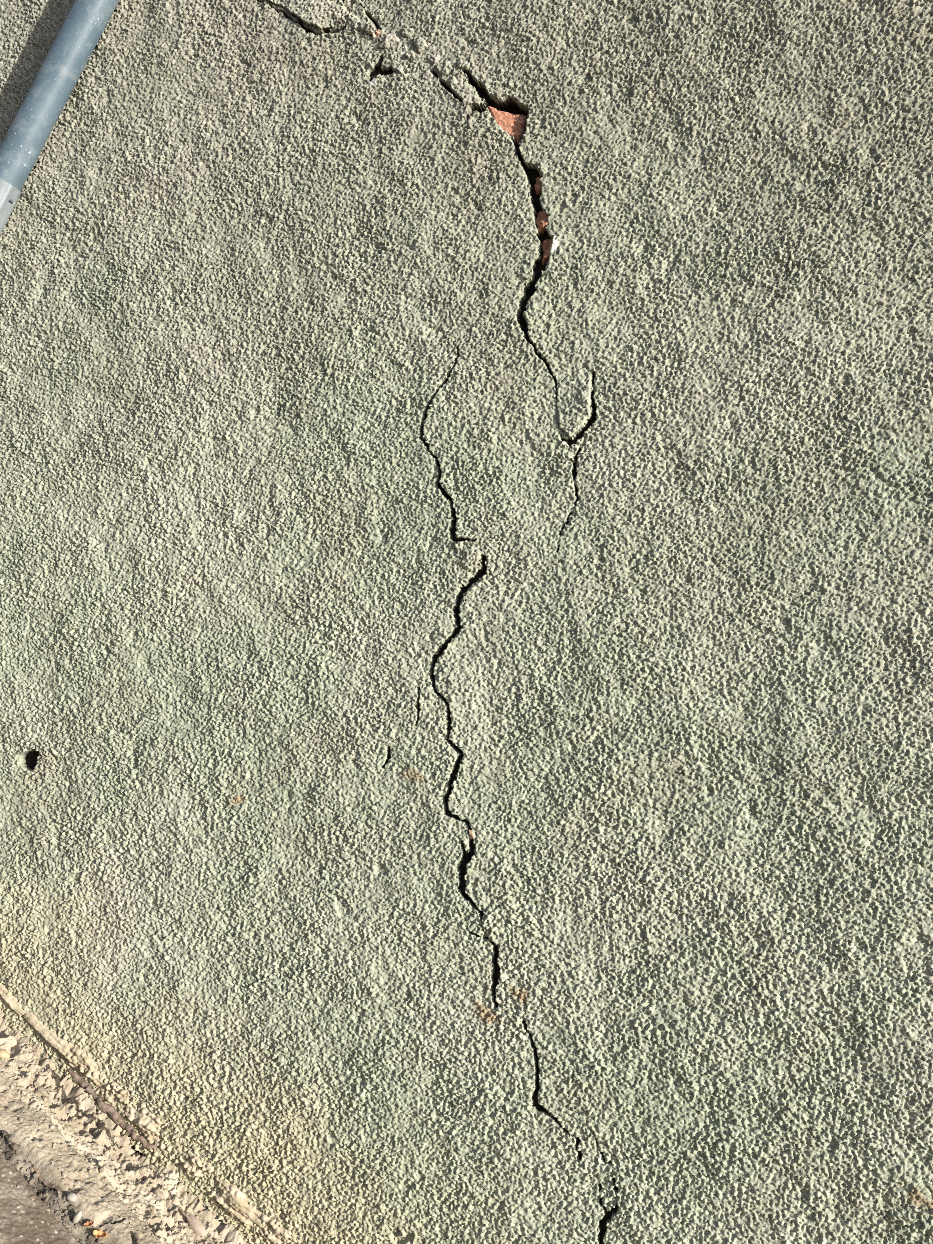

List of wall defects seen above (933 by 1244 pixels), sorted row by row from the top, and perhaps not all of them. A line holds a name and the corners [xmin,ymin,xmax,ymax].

crack [435,74,597,552]
crack [417,349,500,1005]
crack [524,1021,618,1244]